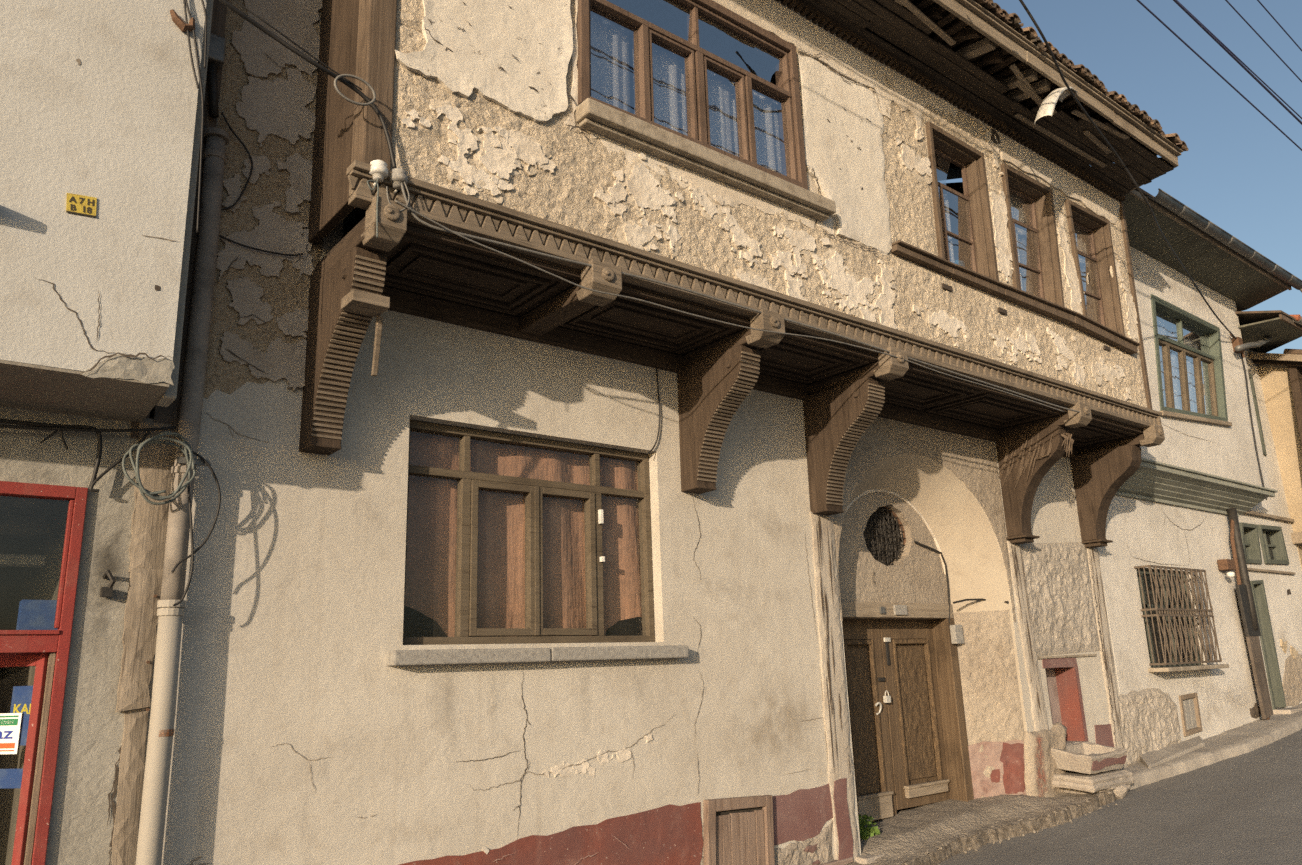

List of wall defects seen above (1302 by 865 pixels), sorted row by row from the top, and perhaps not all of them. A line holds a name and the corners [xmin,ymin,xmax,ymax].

flaking render [204,0,323,399]
flaking render [391,0,1147,408]
crack [34,277,172,374]
flaking render [1280,639,1302,708]
crack [272,743,329,792]
crack [460,615,704,862]
flaking render [542,749,631,778]